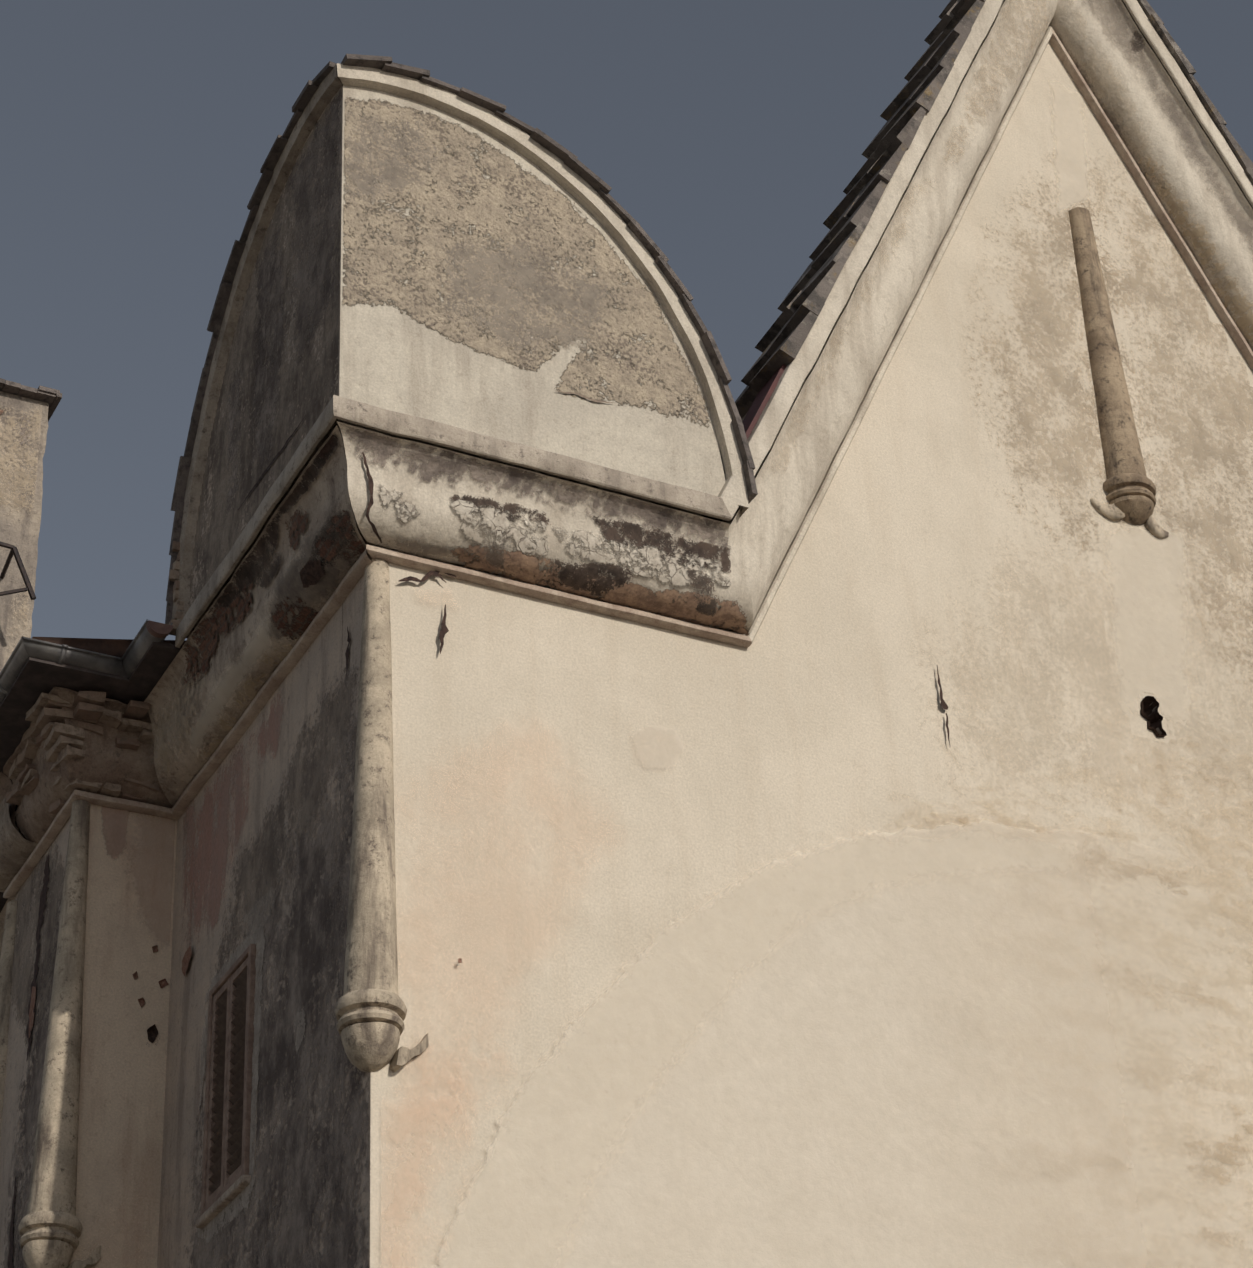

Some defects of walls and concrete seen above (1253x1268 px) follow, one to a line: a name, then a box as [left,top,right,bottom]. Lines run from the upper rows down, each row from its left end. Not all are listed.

damp [227,91,342,512]
spalling [342,97,711,428]
spalling [182,435,365,687]
crack [362,452,382,543]
crack [399,571,457,654]
spalling [447,499,749,635]
crack [937,666,950,745]
hole [1140,696,1167,737]
damp [215,667,359,978]
crack [26,855,50,1061]
spalling [147,1024,160,1046]
crack [7,1177,16,1268]